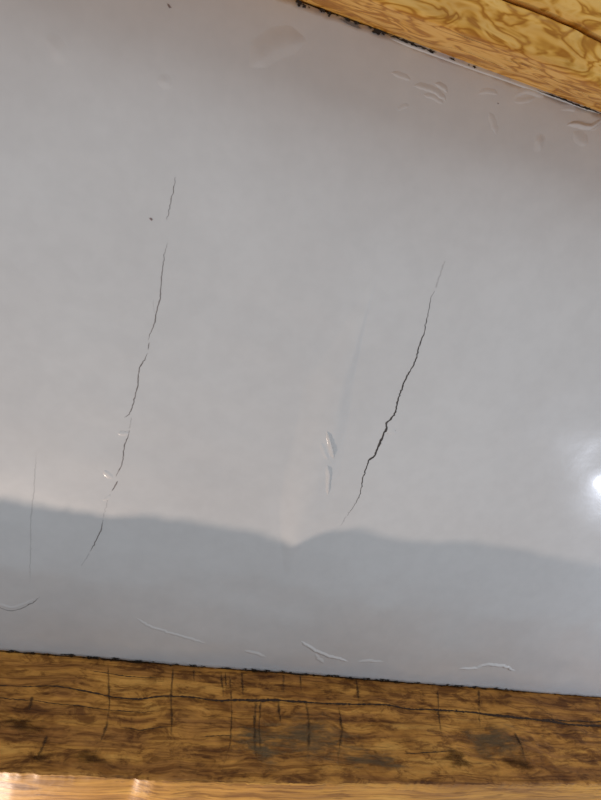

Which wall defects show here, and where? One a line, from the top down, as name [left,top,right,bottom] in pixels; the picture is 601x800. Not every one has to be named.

crack [103,249,166,501]
crack [355,299,431,504]